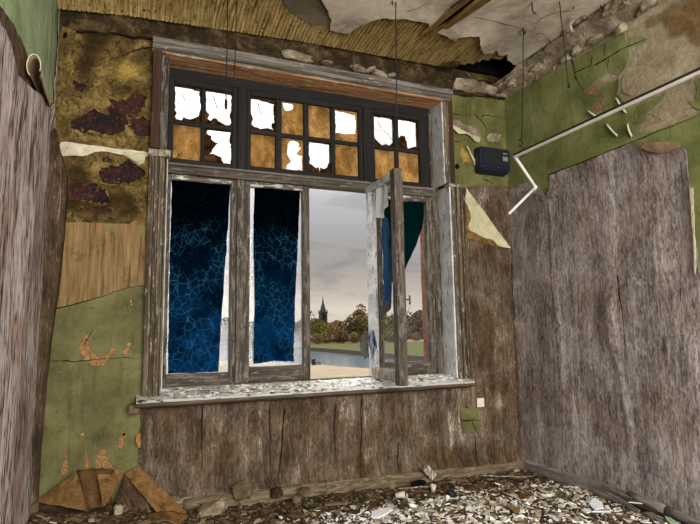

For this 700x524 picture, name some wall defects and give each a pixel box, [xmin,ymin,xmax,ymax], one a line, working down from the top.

crack [571,39,646,85]
flaking render [585,13,700,121]
flaking render [67,87,151,139]
flaking render [69,156,149,214]
crack [54,330,139,362]
peeling [79,335,131,366]
peeling [78,433,119,474]